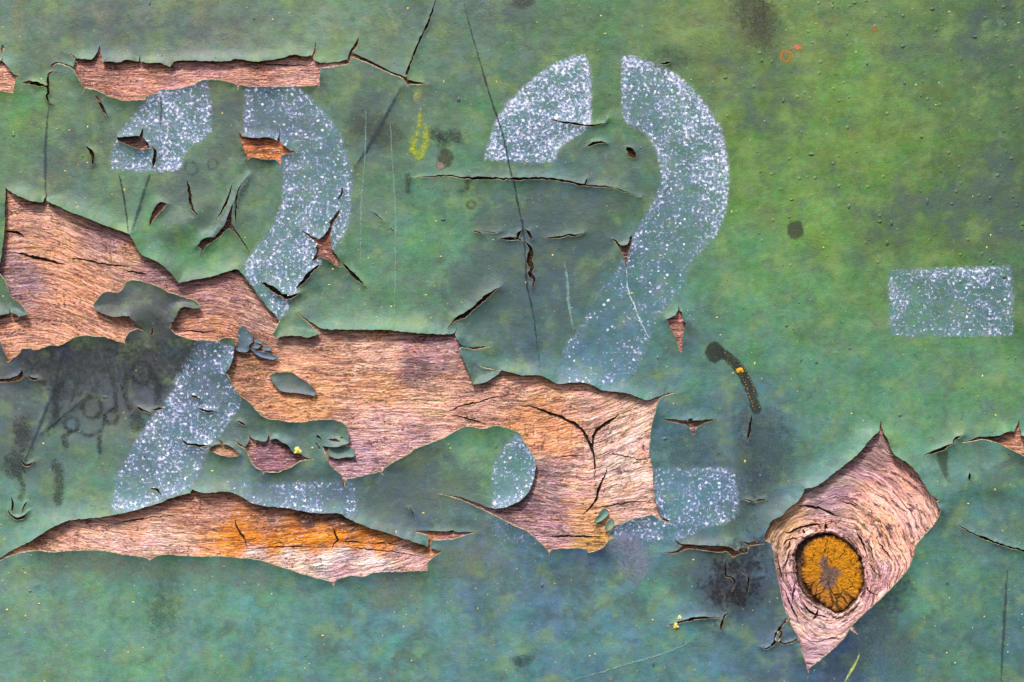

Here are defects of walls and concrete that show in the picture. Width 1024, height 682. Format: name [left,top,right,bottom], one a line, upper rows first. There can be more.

peeling [47,38,428,108]
peeling [239,132,295,166]
crack [414,4,642,367]
peeling [0,185,718,558]
peeling [0,478,476,588]
crack [450,396,647,538]
peeling [666,422,952,679]
peeling [953,422,1024,467]